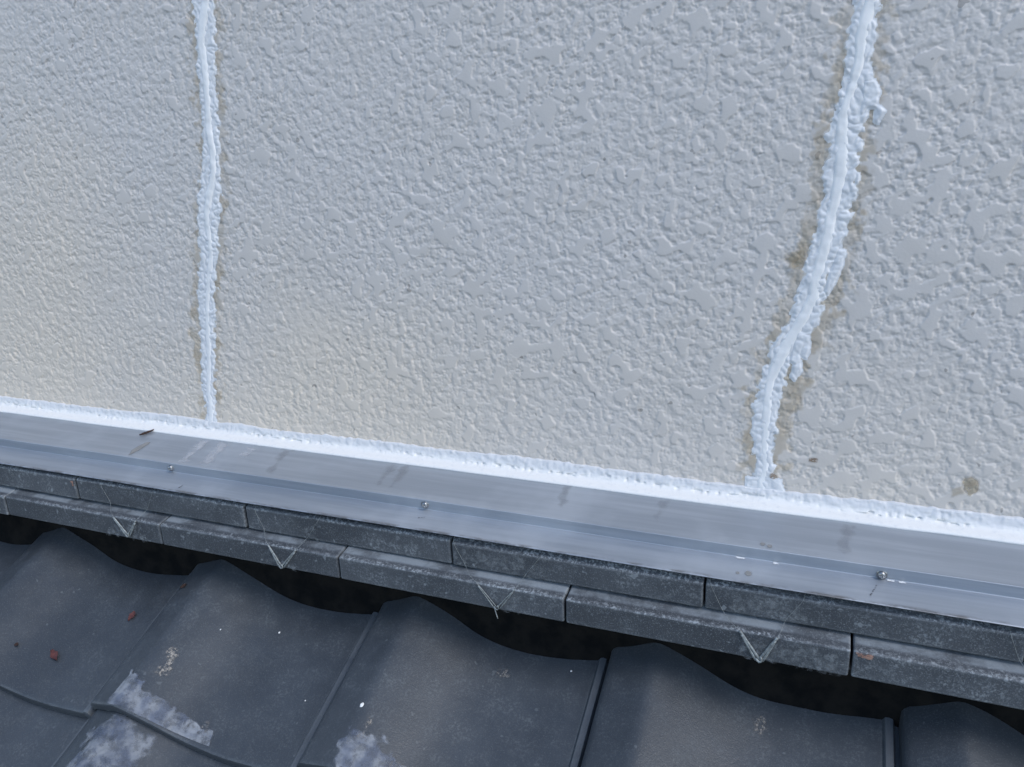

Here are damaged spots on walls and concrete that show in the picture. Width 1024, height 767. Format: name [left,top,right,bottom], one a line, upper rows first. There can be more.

crack [191,0,223,422]
crack [744,0,887,492]